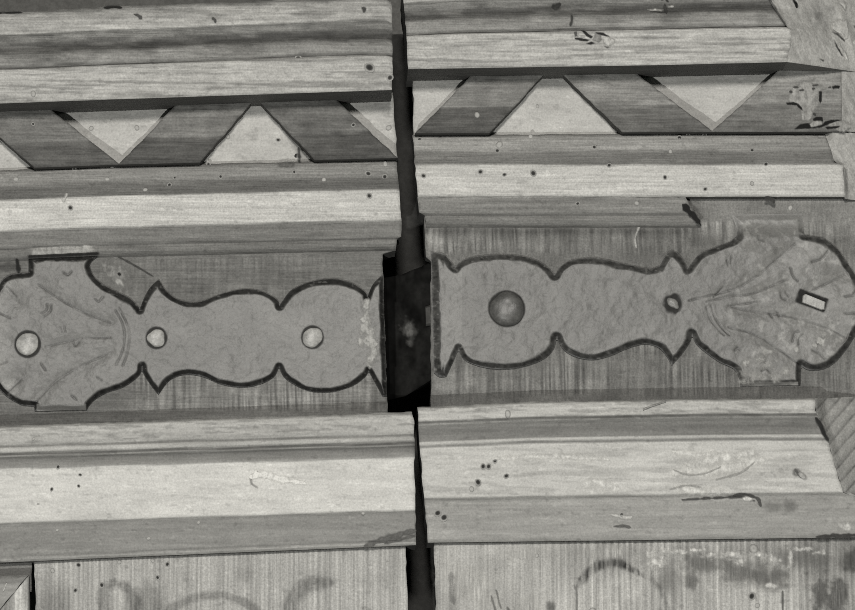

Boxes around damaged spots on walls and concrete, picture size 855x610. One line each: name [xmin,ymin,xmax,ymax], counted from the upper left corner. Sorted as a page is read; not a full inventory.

peeling [833,20,855,61]
damp [686,558,710,587]
damp [730,566,786,610]
damp [813,579,847,610]